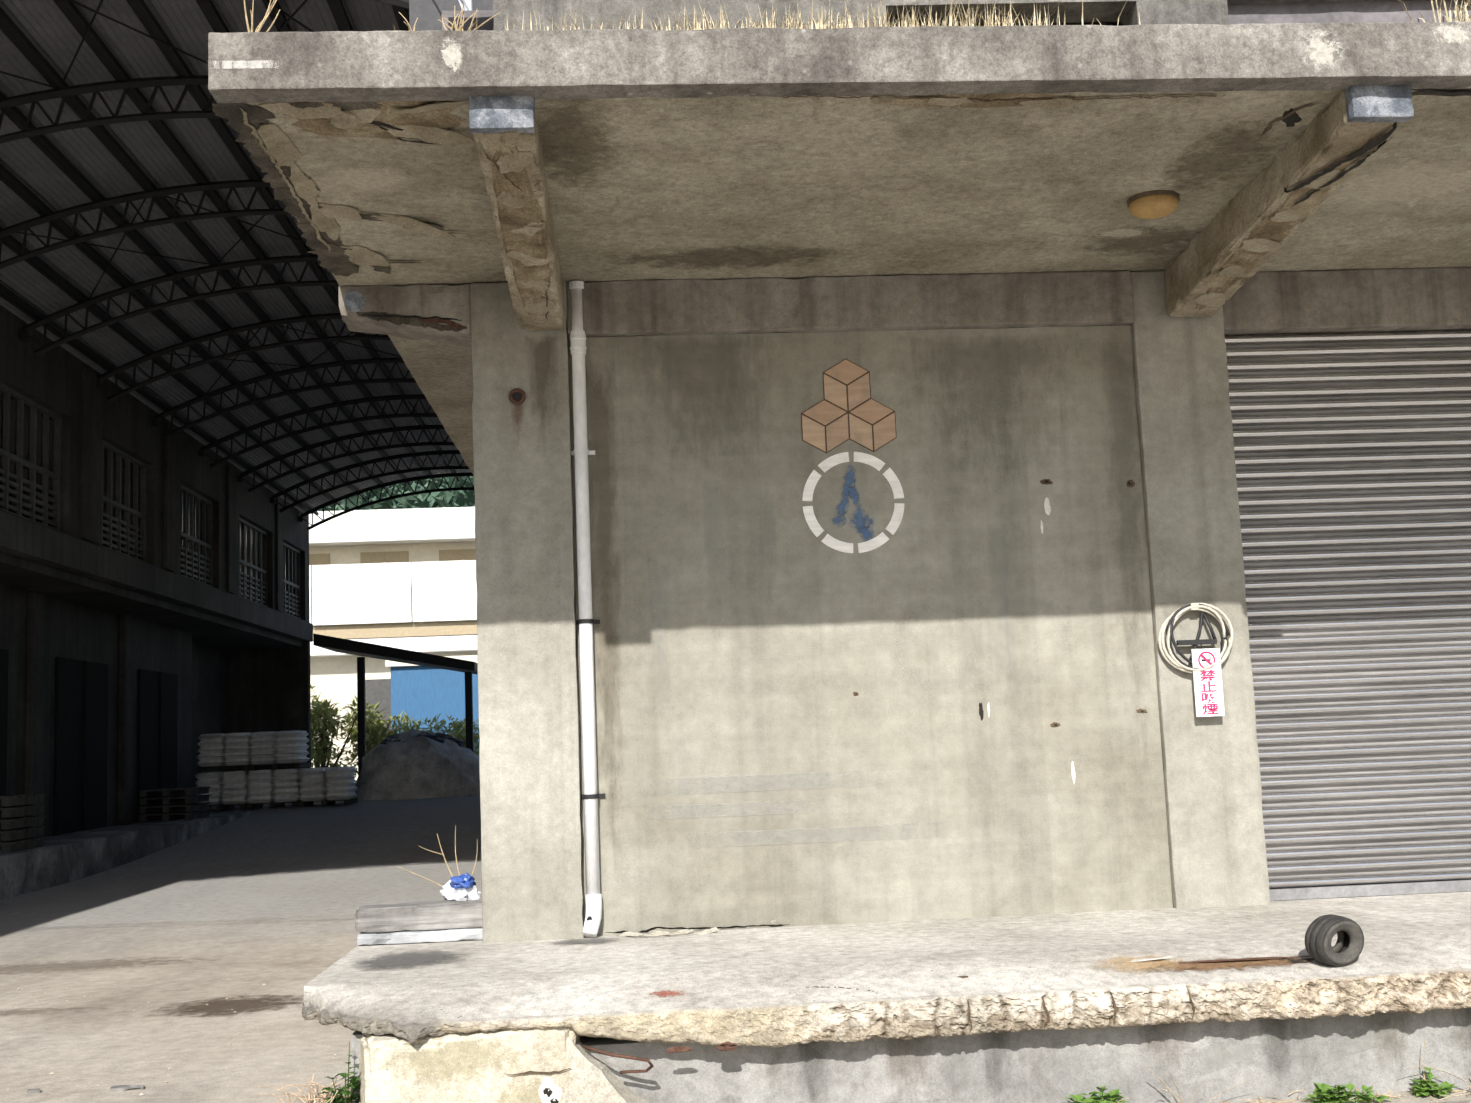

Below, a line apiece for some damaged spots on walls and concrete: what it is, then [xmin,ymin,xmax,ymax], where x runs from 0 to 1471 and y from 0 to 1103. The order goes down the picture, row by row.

spalling [212,101,556,320]
damp [632,248,819,267]
spalling [1193,122,1397,311]
rust [1107,955,1315,971]